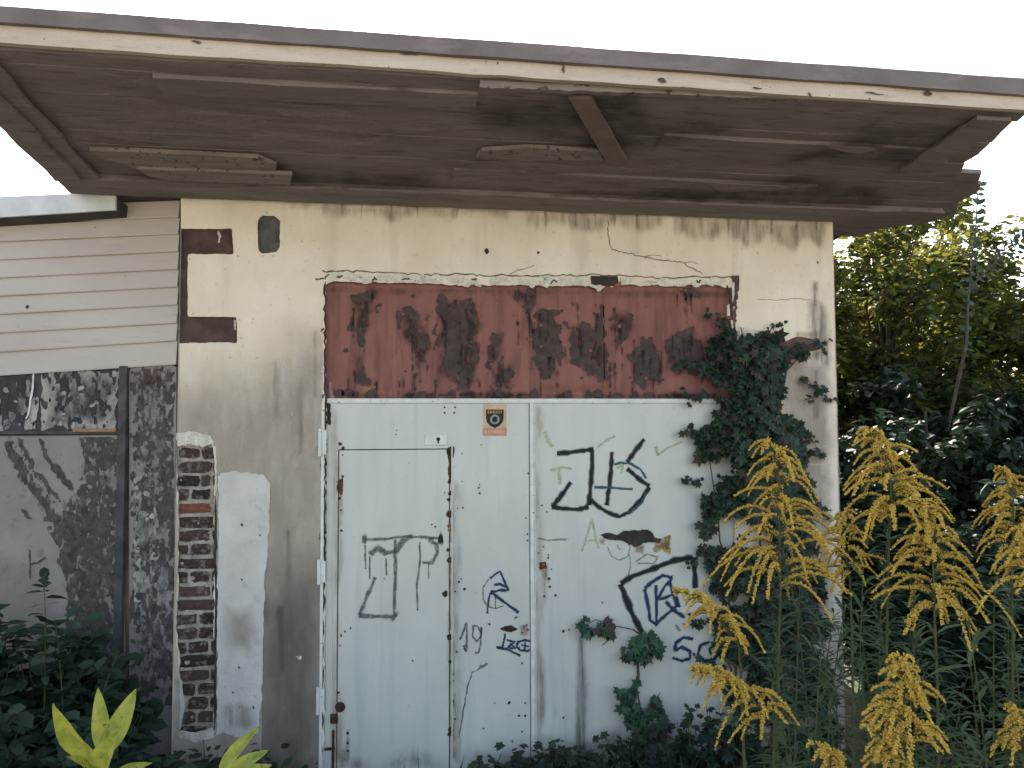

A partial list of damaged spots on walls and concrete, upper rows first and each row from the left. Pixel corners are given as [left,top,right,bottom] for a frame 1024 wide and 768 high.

crack [607,222,702,274]
spalling [326,269,731,395]
corrosion [325,475,344,511]
corrosion [431,446,464,532]
flaking render [0,366,270,742]